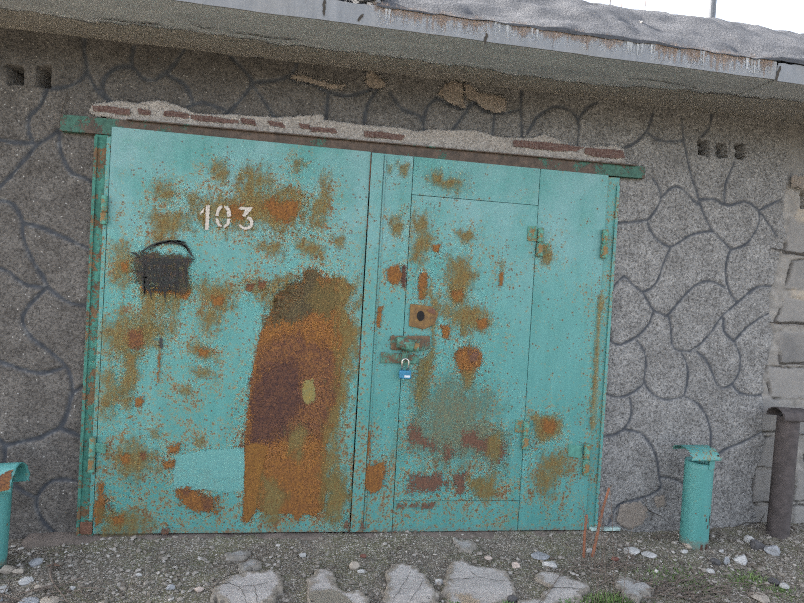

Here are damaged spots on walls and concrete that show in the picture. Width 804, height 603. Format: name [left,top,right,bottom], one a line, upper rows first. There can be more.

flaking render [89,100,626,164]
flaking render [438,80,507,113]
corrosion [426,169,468,198]
corrosion [95,157,362,523]
corrosion [365,210,513,503]
corrosion [589,295,605,429]
corrosion [0,469,14,492]
corrosion [528,412,571,501]